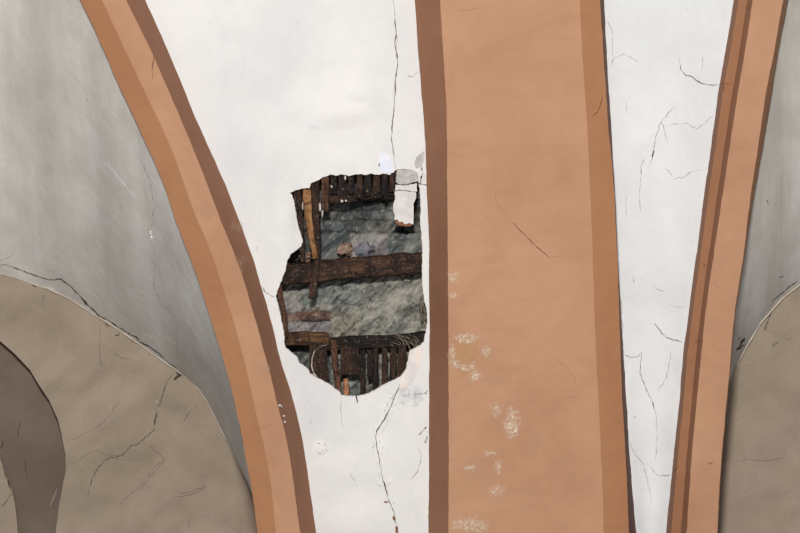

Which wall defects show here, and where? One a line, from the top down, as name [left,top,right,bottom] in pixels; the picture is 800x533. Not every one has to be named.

crack [0,150,178,506]
flaking render [276,151,428,396]
crack [371,384,428,533]
crack [391,2,418,169]
leakage [450,333,482,380]
crack [495,191,561,269]
crack [626,323,700,495]
crack [625,105,713,215]
crack [679,59,733,91]